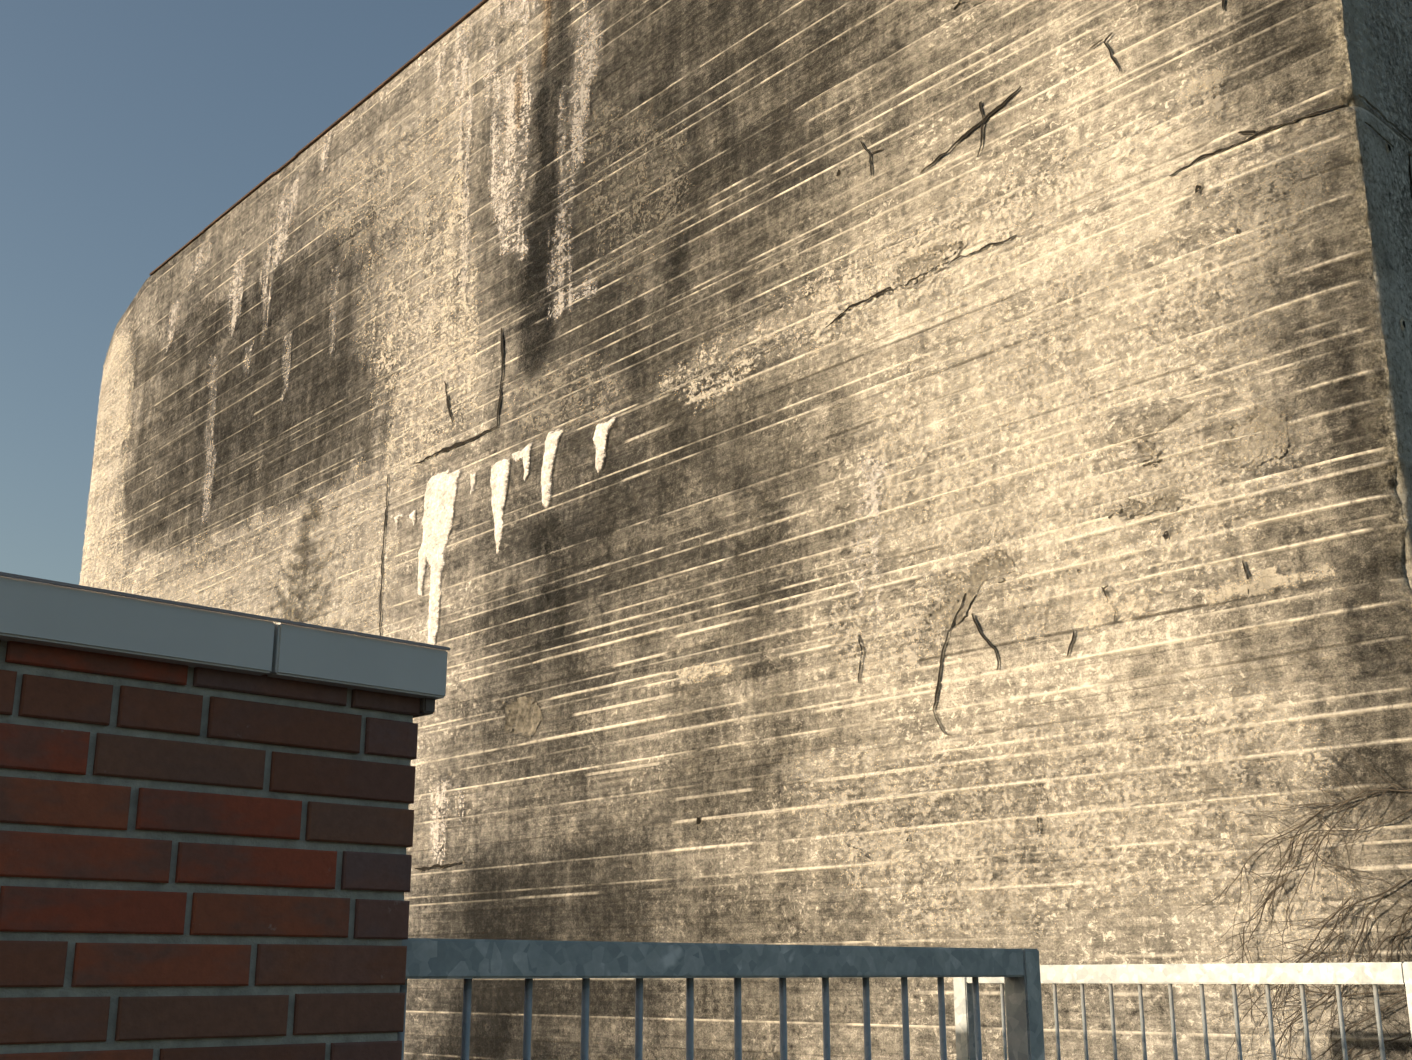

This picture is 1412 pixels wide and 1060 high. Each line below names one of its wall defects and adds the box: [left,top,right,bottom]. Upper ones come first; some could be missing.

water stain [434,0,539,295]
water stain [228,178,299,334]
water stain [548,273,597,319]
crack [932,594,999,735]